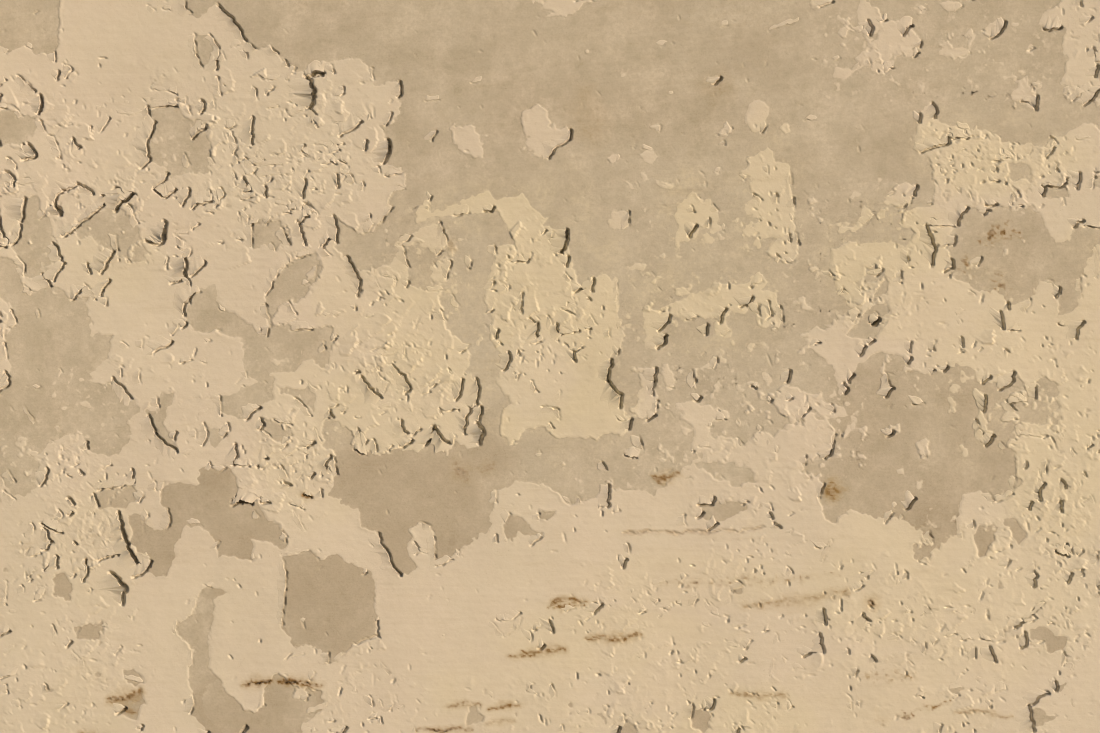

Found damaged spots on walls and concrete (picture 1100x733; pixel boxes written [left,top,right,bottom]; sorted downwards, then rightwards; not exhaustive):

peeling [0,0,698,684]
peeling [816,101,1100,733]
peeling [311,272,1024,733]
crack [117,512,141,566]
peeling [172,525,379,733]
rust [504,639,572,664]
rust [546,592,593,614]
rust [583,627,649,649]
rust [238,670,329,697]
rust [441,696,527,715]